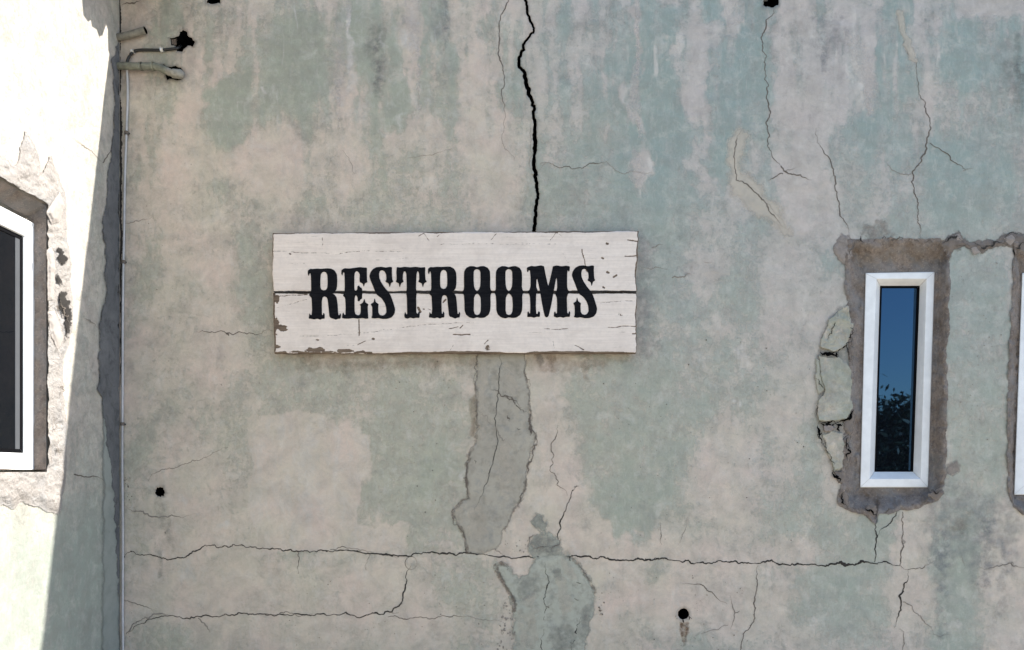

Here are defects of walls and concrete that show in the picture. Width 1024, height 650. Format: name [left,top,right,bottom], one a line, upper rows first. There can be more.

peeling [47,191,65,224]
flaking render [47,246,72,349]
crack [498,0,648,232]
crack [733,10,849,232]
flaking render [833,232,1024,265]
crack [888,52,972,228]
flaking render [814,306,944,519]
crack [124,427,947,650]